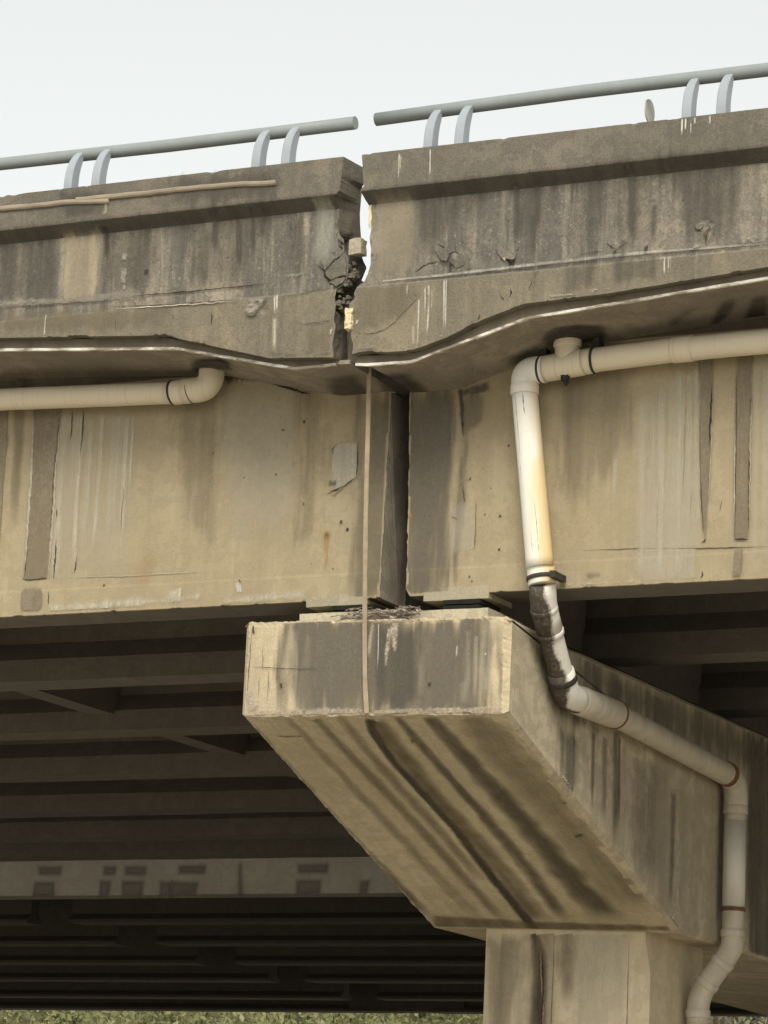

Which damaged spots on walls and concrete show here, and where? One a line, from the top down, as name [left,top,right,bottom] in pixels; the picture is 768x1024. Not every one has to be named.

crack [287,240,346,296]
efflorescence [54,418,134,560]
water stain [380,377,462,593]
water stain [100,867,145,896]
water stain [160,866,205,896]
water stain [278,618,666,1024]